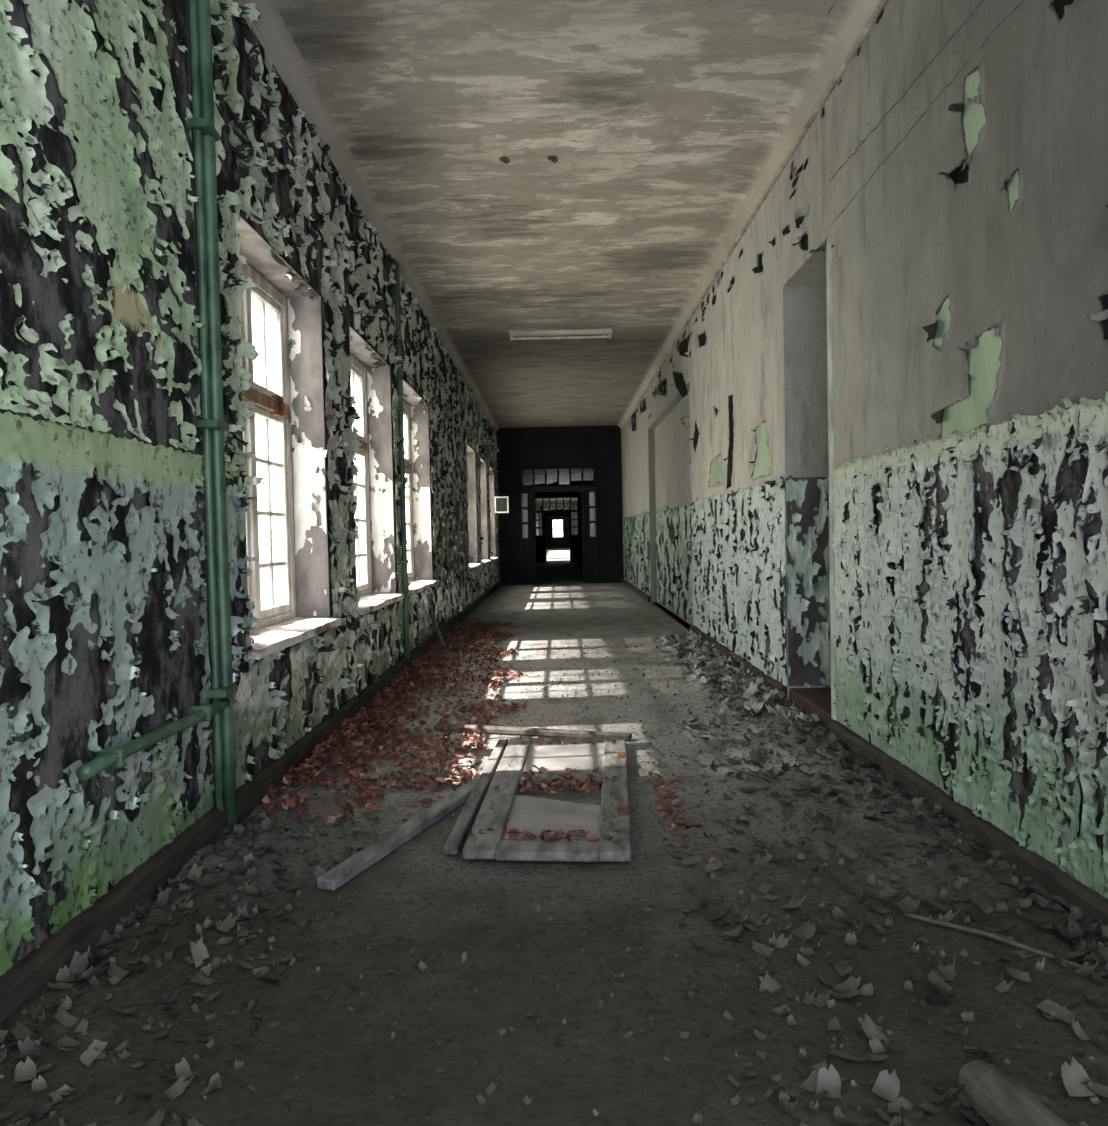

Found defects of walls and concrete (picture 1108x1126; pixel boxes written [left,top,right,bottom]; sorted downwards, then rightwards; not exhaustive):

peeling [0,0,214,976]
peeling [210,0,501,789]
peeling [738,155,811,276]
peeling [622,269,1108,898]
peeling [937,63,990,191]
peeling [1000,162,1024,218]